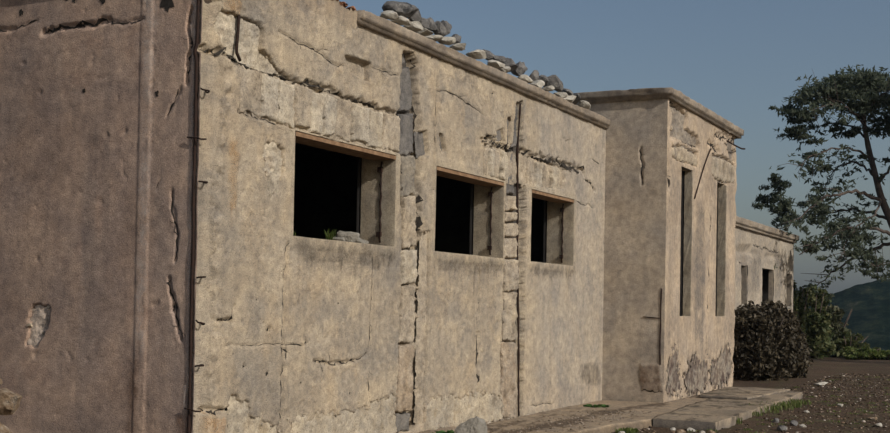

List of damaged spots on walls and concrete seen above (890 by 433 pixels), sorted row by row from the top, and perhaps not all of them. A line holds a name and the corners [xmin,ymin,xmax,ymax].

crack [0,18,144,33]
spalling [27,305,51,348]
crack [156,180,185,339]
spalling [184,0,212,433]
crack [226,267,373,418]
spalling [214,11,562,433]
crack [482,134,599,208]
peeling [643,288,733,401]